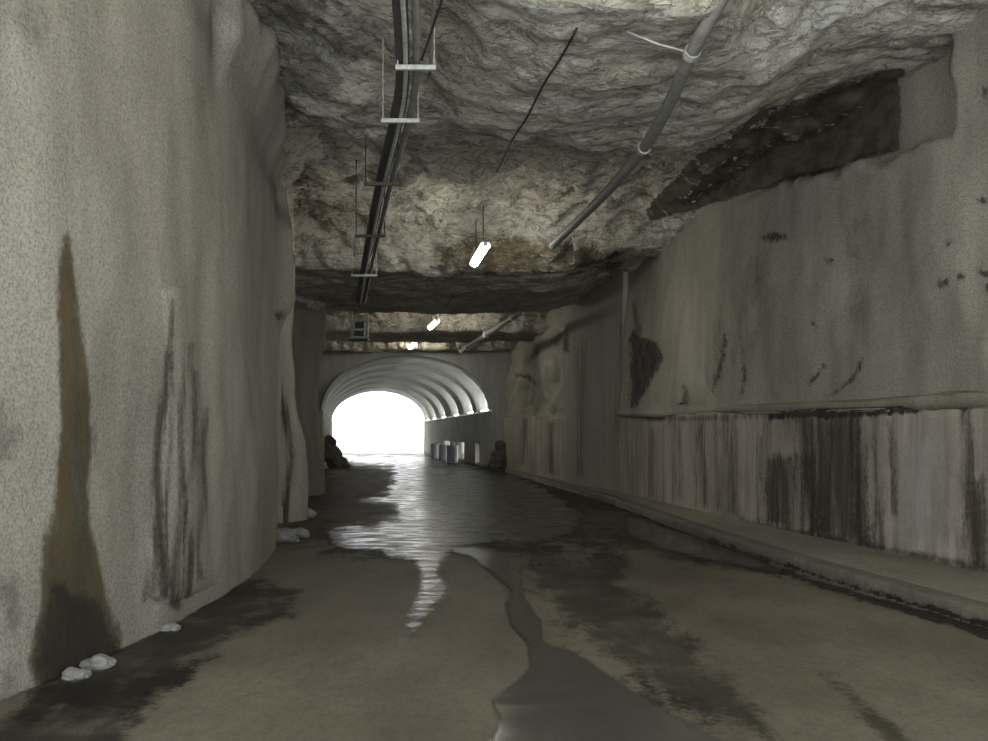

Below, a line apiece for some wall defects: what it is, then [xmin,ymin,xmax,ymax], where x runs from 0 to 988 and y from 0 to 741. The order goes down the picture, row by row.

damp [0,235,304,741]
damp [281,385,399,539]
damp [481,469,988,651]
damp [762,406,922,549]
damp [906,407,986,570]